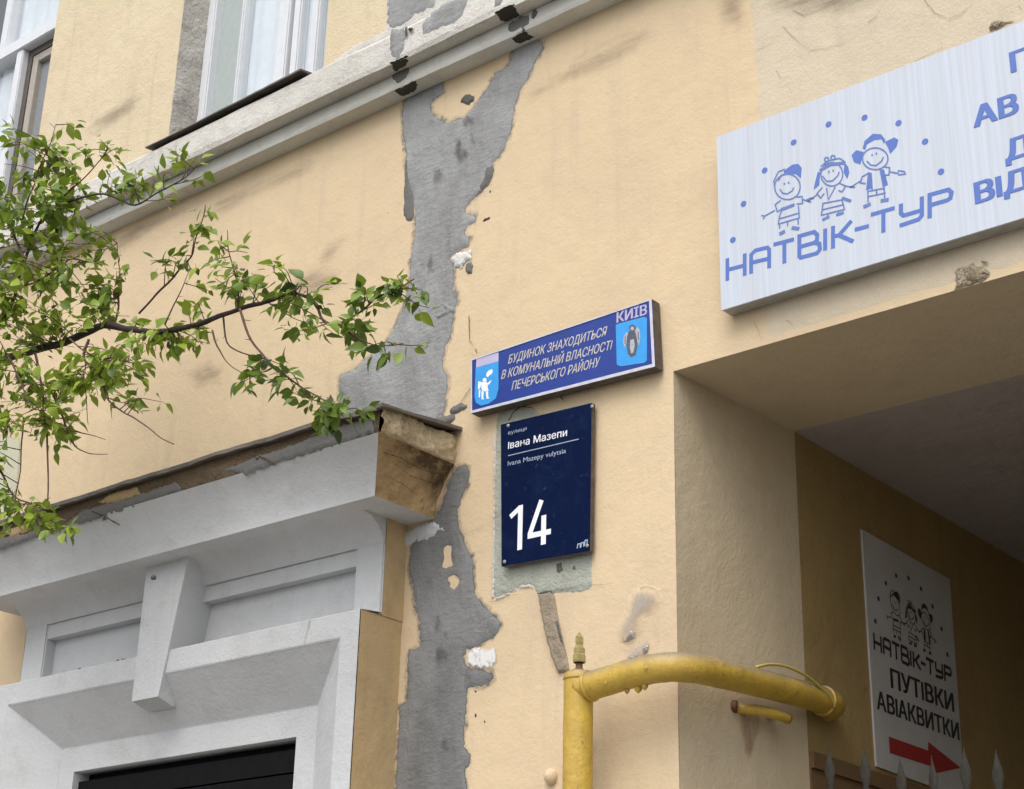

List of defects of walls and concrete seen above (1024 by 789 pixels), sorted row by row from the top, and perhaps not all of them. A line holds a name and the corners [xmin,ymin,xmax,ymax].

peeling [451,249,473,274]
peeling [99,487,140,503]
peeling [2,524,32,537]
peeling [468,647,496,668]